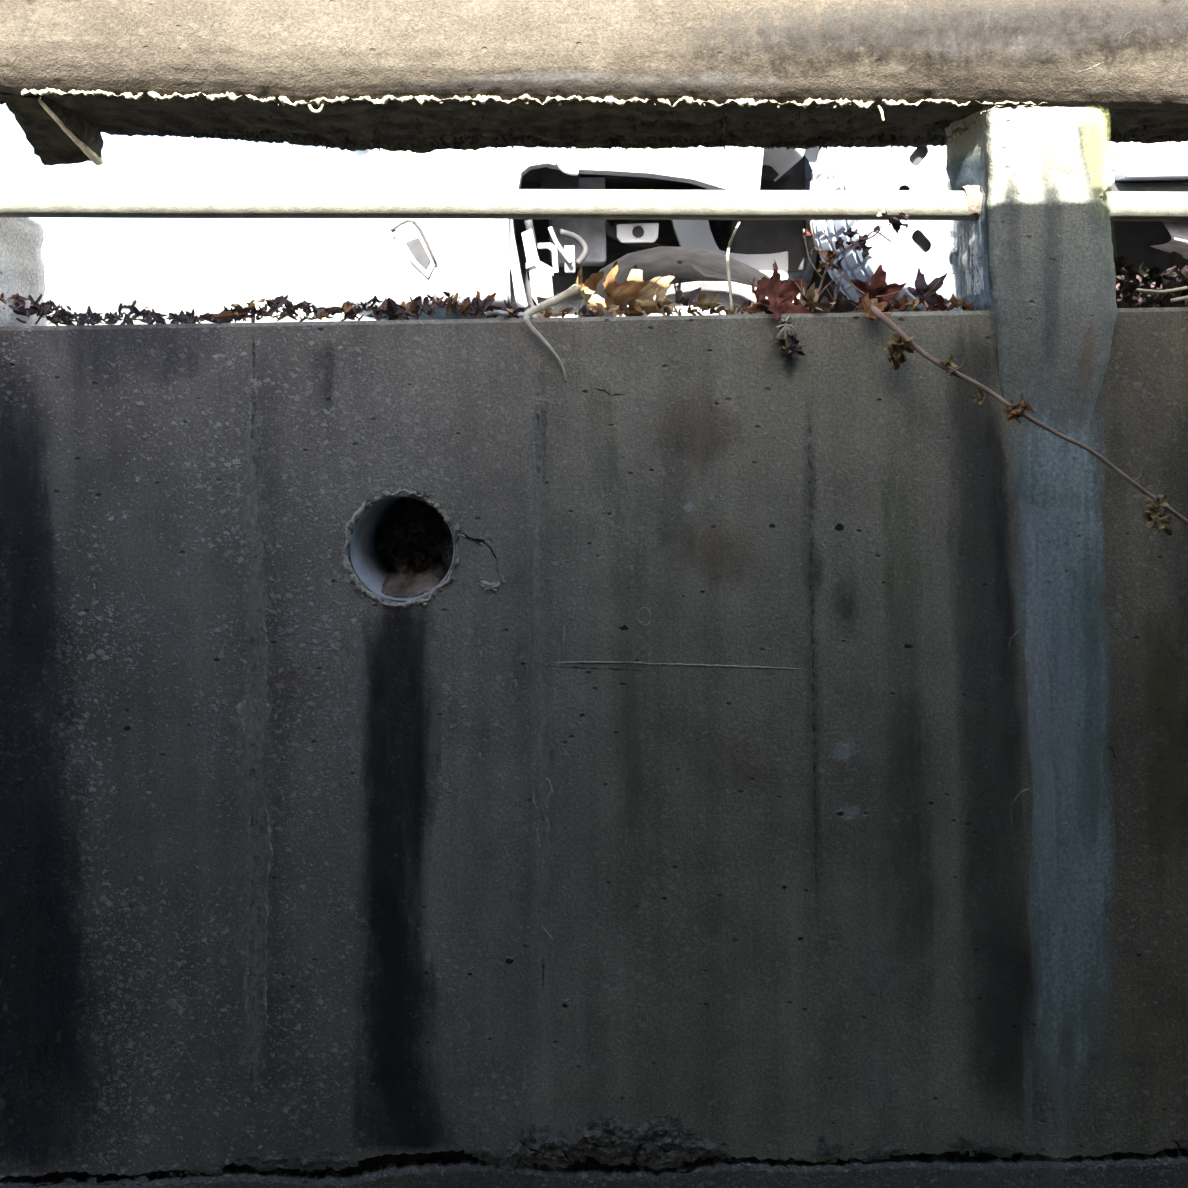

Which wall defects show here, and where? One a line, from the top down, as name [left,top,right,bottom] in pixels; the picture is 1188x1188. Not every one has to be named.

crack [455,530,500,578]
water stain [1000,400,1113,1099]
water stain [0,395,86,1165]
water stain [356,607,441,1149]
crack [6,1169,186,1187]
crack [222,1150,477,1174]
spalling [501,1112,732,1170]
crack [514,1134,799,1174]
crack [889,1150,1042,1159]
crack [1109,1139,1188,1156]